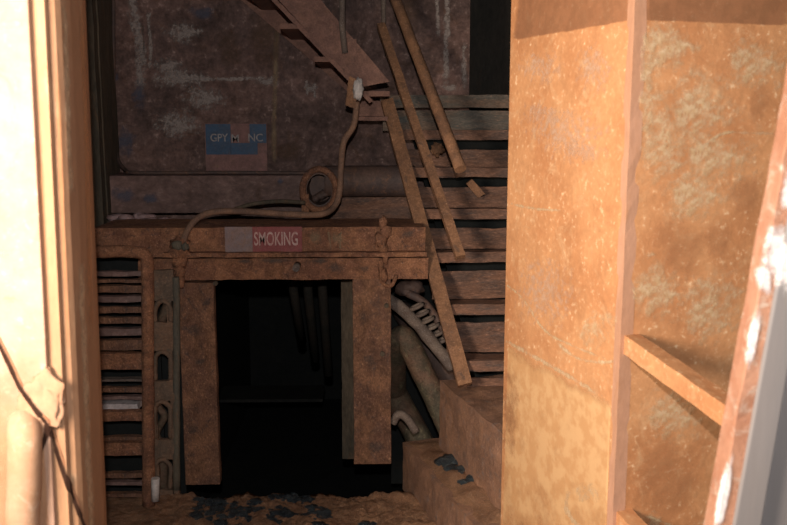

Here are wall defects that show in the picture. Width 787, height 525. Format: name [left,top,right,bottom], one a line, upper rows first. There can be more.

peeling [755,227,787,292]
corrosion [703,70,787,525]
peeling [745,317,760,362]
peeling [715,464,731,525]